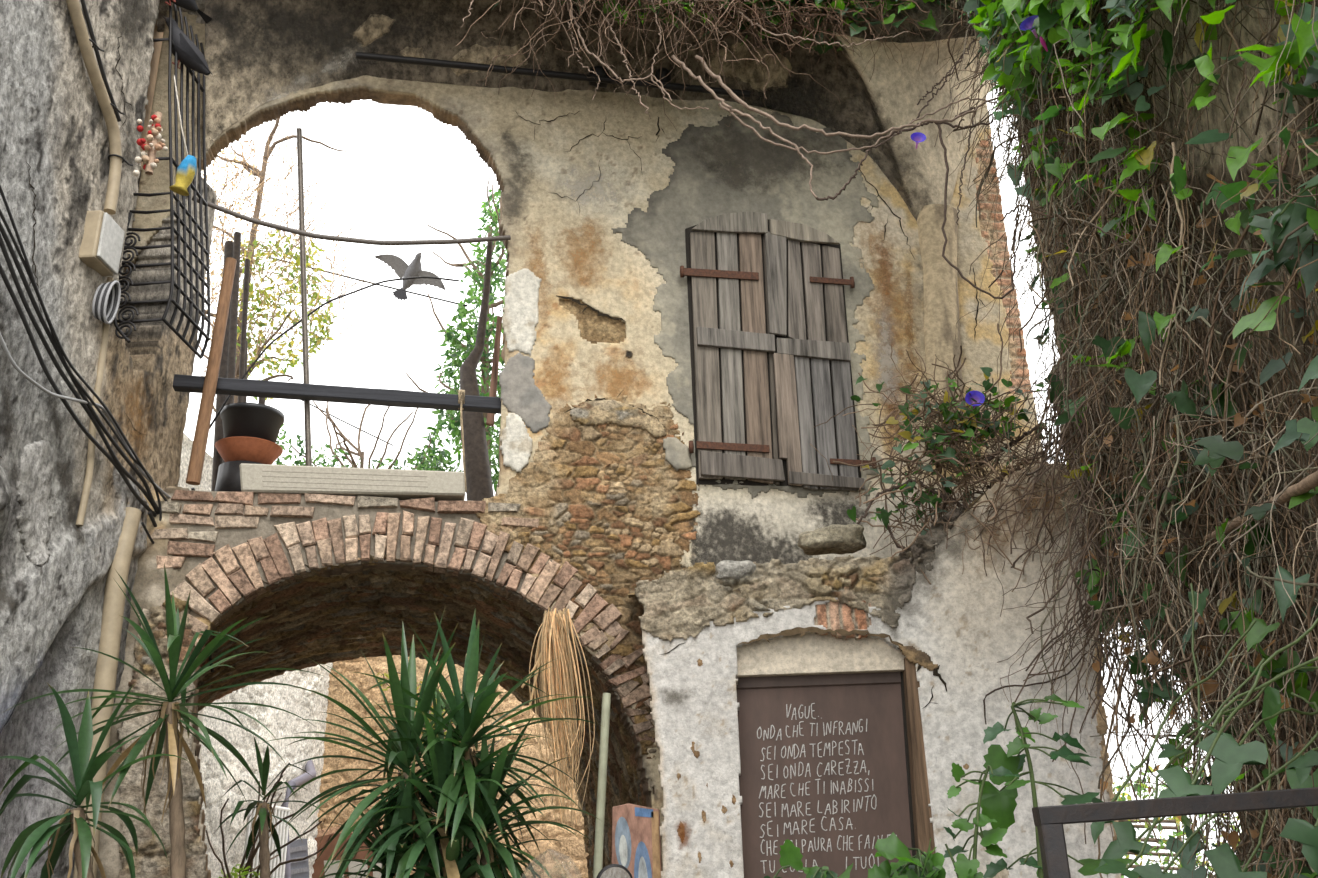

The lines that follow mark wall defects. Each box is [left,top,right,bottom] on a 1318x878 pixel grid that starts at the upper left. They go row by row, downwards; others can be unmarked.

crack [516,111,665,216]
flaking render [502,268,542,356]
rust [530,248,547,314]
rust [568,224,604,284]
flaking render [559,298,633,358]
flaking render [570,399,667,438]
flaking render [635,506,963,642]
flaking render [898,644,938,671]